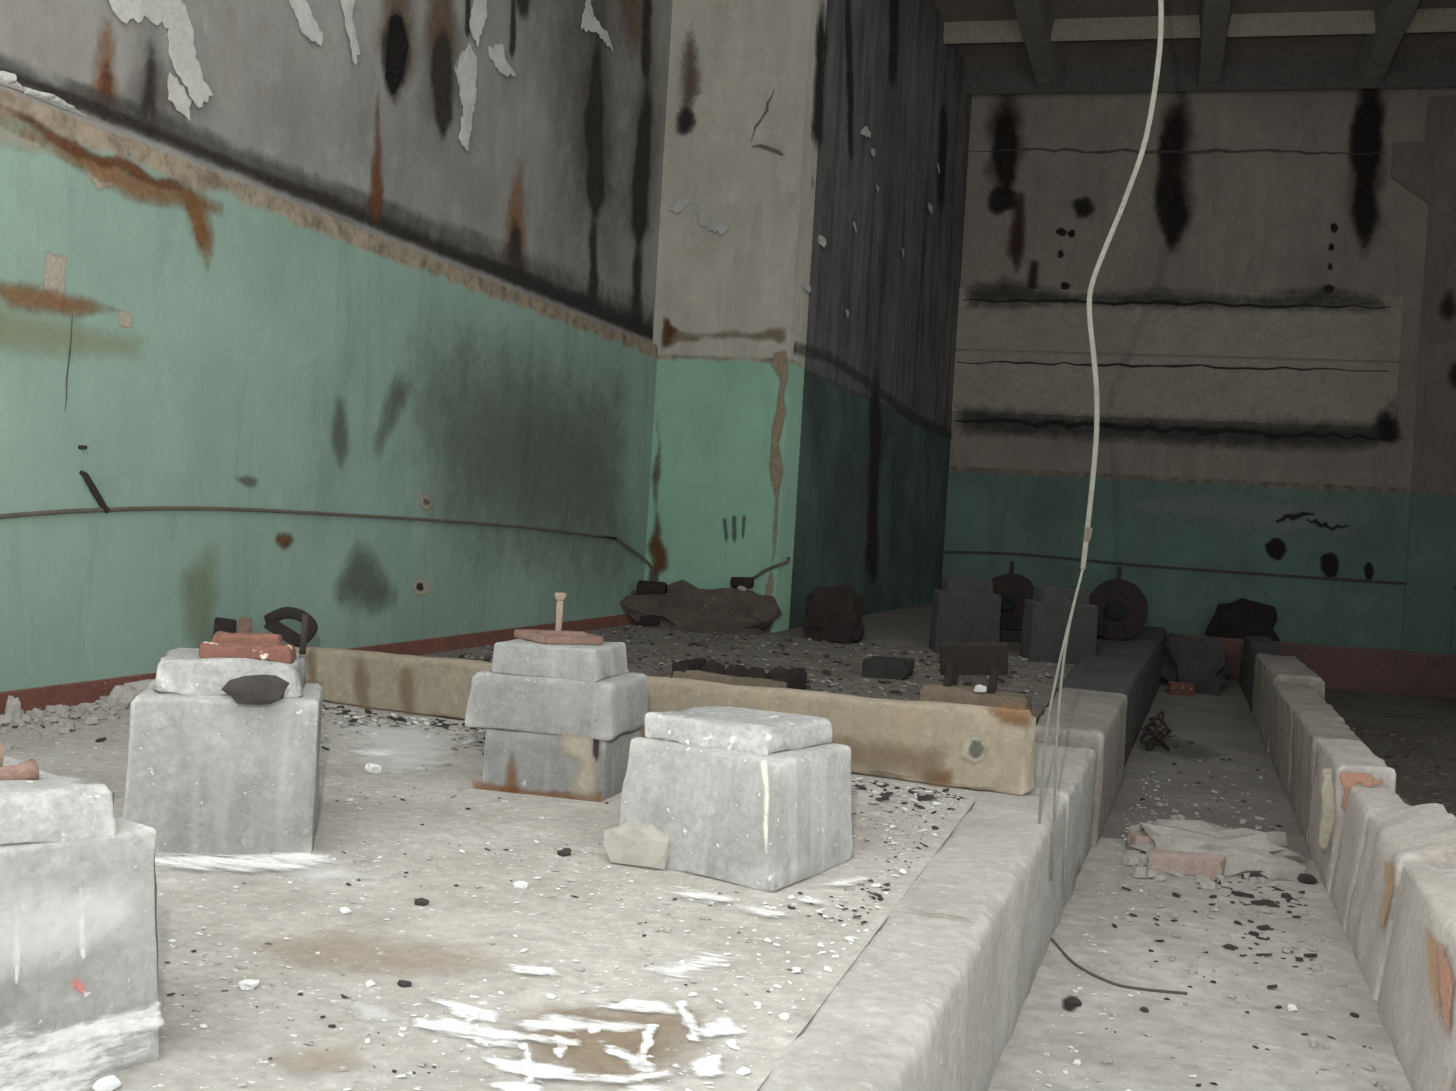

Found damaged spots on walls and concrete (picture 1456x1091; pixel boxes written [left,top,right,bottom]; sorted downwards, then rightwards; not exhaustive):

rust [95,33,114,116]
rust [19,114,216,251]
peeling [109,0,212,121]
peeling [454,0,516,151]
leakage [585,51,604,214]
leakage [631,92,652,242]
leakage [1350,89,1383,241]
rust [0,286,95,314]
leakage [334,409,346,455]
leakage [343,556,386,602]